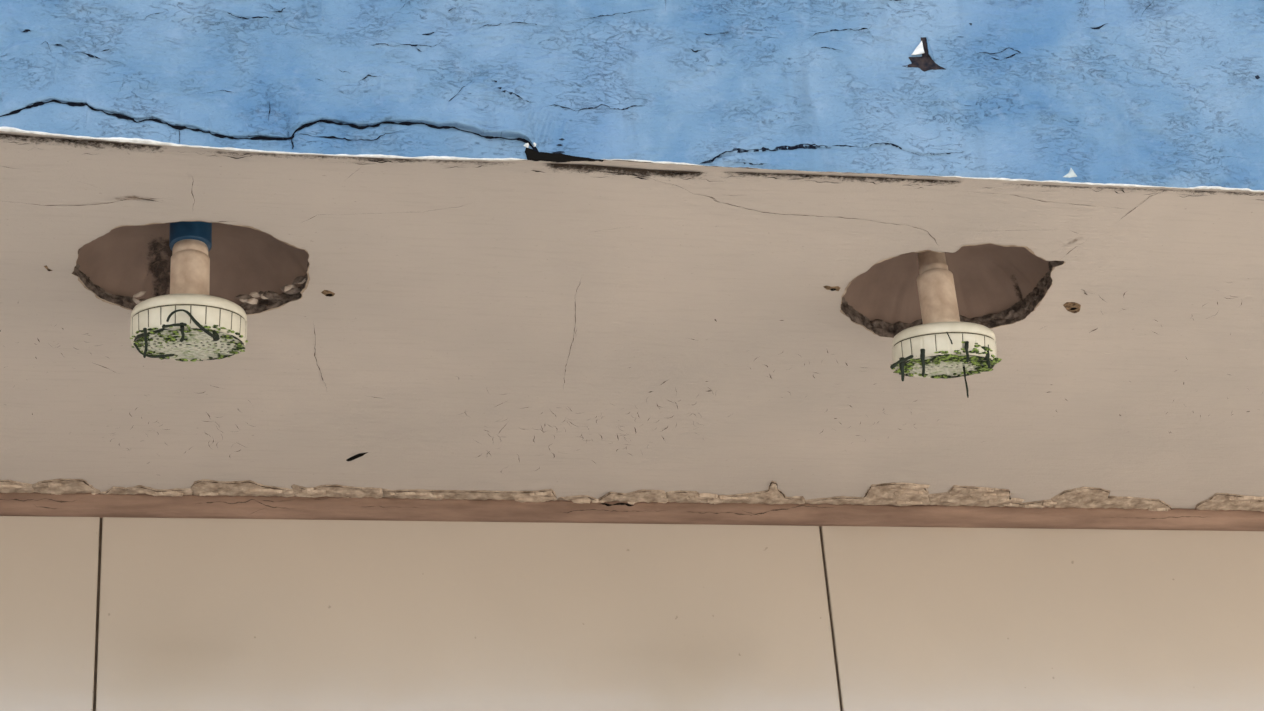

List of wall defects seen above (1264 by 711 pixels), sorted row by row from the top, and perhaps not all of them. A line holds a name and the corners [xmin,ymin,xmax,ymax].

crack [23,29,121,63]
crack [227,8,298,29]
crack [375,7,550,52]
peeling [904,37,946,72]
crack [505,90,648,111]
crack [0,81,539,178]
crack [573,143,957,245]
spalling [71,220,335,315]
spalling [823,243,1066,338]
spalling [1063,302,1081,313]
spalling [0,478,1172,511]
spalling [1195,493,1264,512]